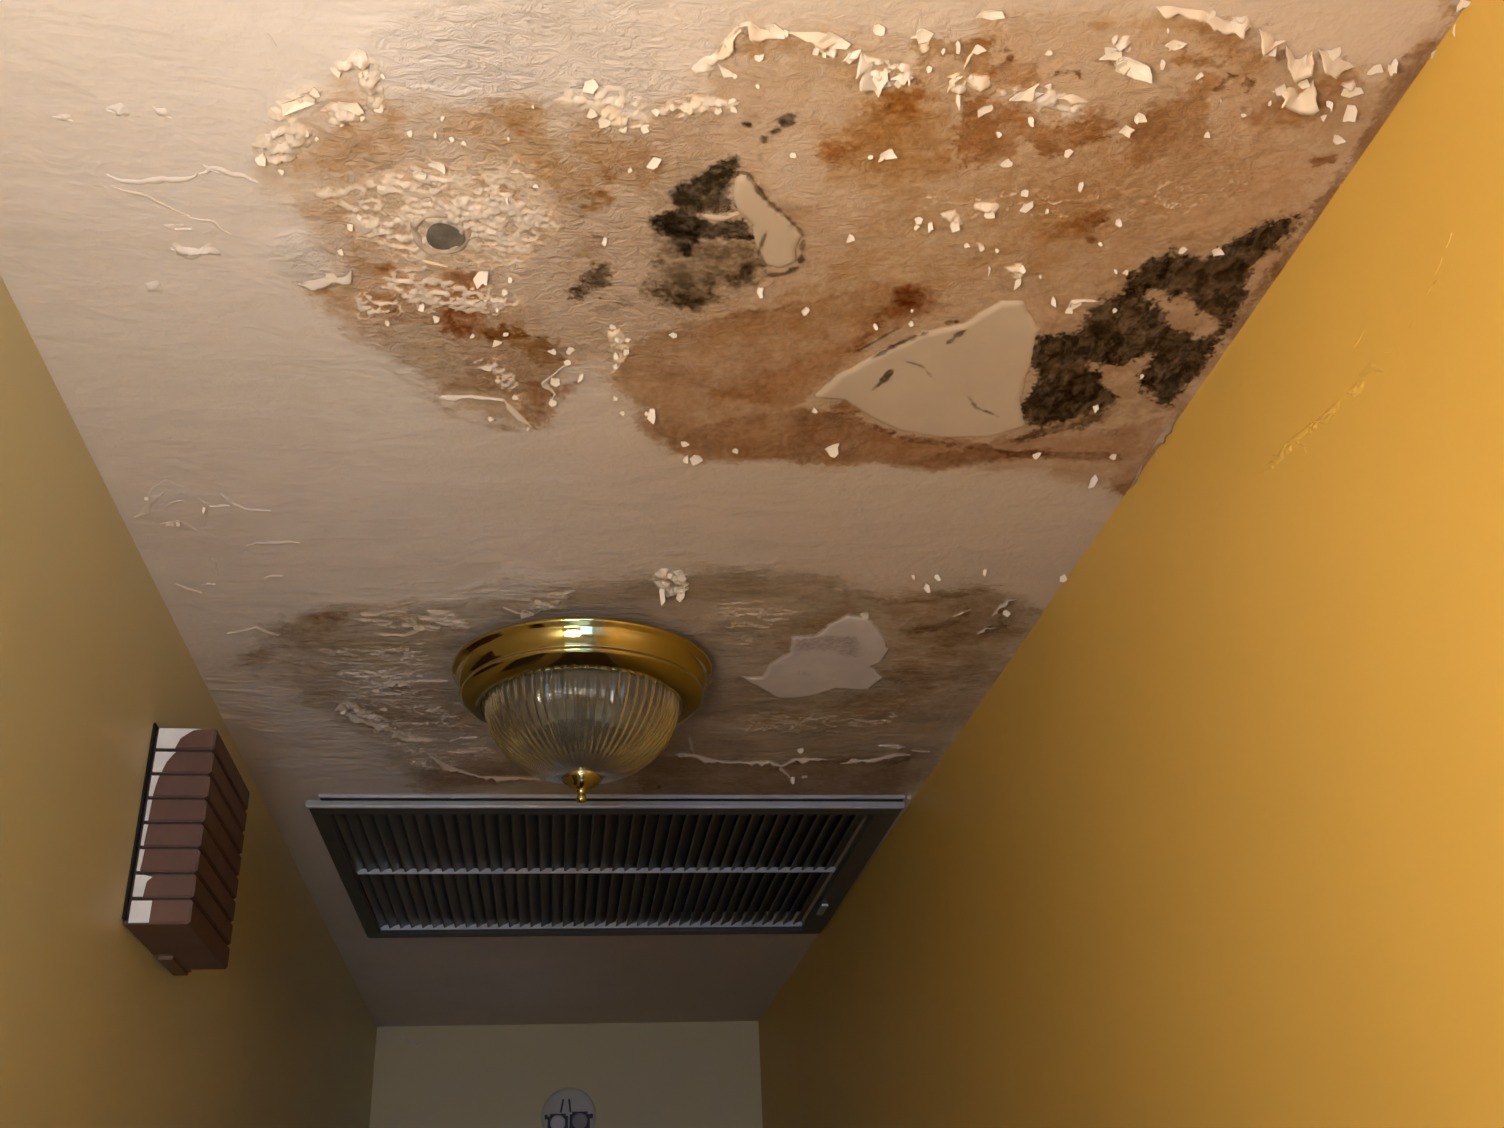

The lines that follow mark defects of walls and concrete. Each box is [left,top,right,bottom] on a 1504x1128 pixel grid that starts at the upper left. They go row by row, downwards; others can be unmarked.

peeling [252,47,386,175]
peeling [299,116,584,431]
mould [570,264,610,298]
mould [651,157,754,305]
flaking render [700,173,804,274]
mould [743,114,794,142]
peeling [553,21,1089,134]
peeling [868,149,898,162]
flaking render [812,158,1257,438]
water stain [1020,215,1299,489]
peeling [1099,6,1399,145]
flaking render [675,574,941,784]